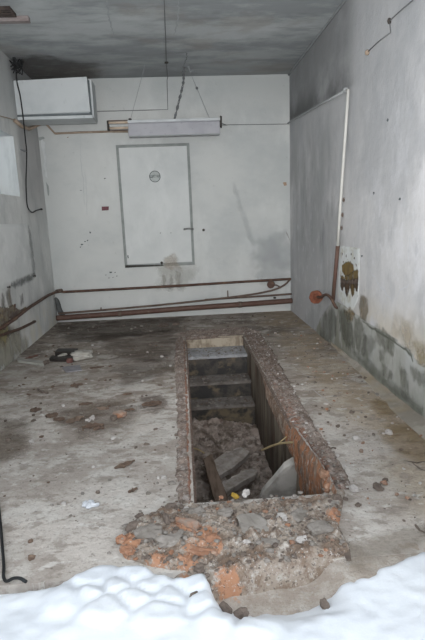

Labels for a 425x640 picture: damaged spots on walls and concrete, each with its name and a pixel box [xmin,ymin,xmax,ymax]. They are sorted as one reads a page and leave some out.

leakage [359,297,368,320]
spalling [115,332,351,602]